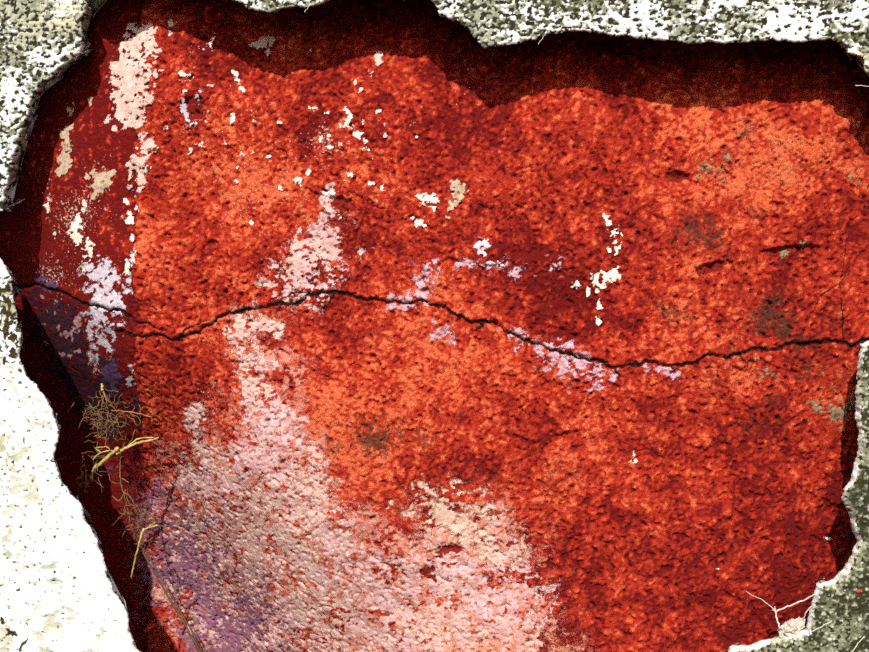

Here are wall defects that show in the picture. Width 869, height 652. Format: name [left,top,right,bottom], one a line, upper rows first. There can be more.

peeling [368,51,383,77]
spalling [848,43,869,71]
peeling [55,102,75,177]
peeling [67,19,174,276]
spalling [178,70,214,126]
peeling [339,107,364,129]
peeling [415,179,469,219]
peeling [473,237,505,267]
peeling [571,213,623,326]
crack [0,243,869,376]
spalling [728,341,869,652]
spalling [419,546,464,583]